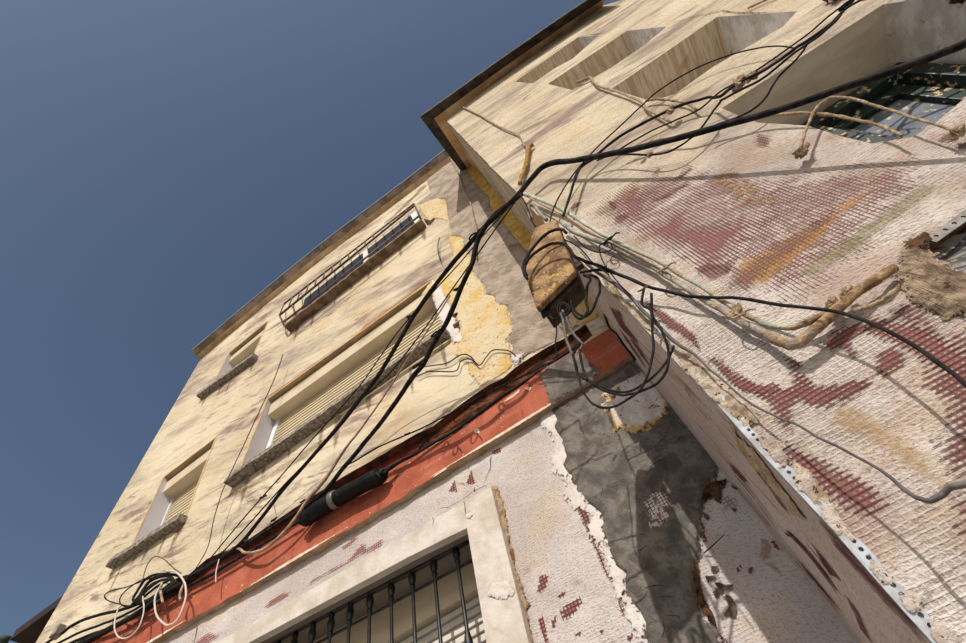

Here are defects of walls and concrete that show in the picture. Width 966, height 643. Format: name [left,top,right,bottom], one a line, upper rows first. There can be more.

peeling [467,166,532,251]
spalling [903,232,933,249]
peeling [418,198,597,450]
peeling [240,527,347,592]
spalling [432,403,650,643]
spalling [692,560,723,639]
spalling [866,554,922,613]